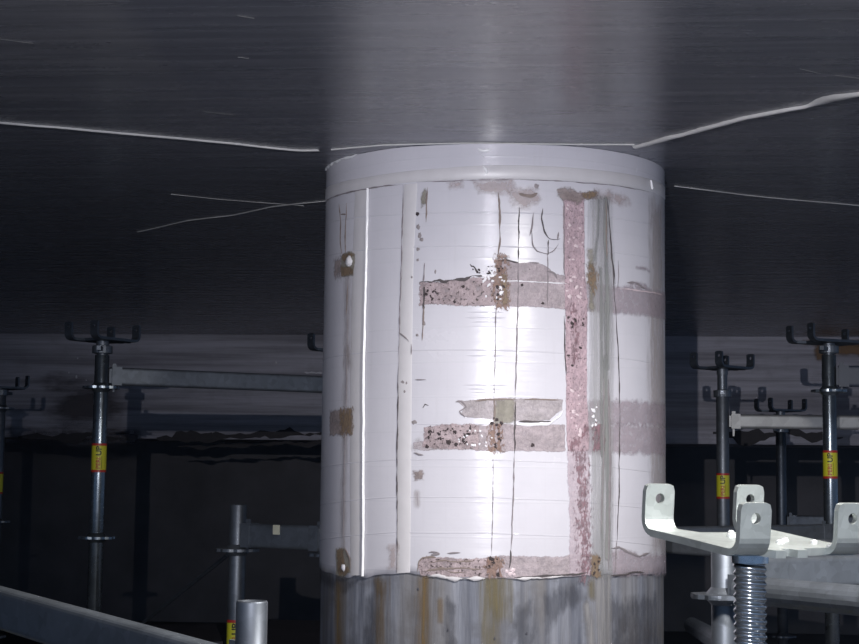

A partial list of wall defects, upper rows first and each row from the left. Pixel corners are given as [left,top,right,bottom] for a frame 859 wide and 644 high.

spalling [411,190,666,584]